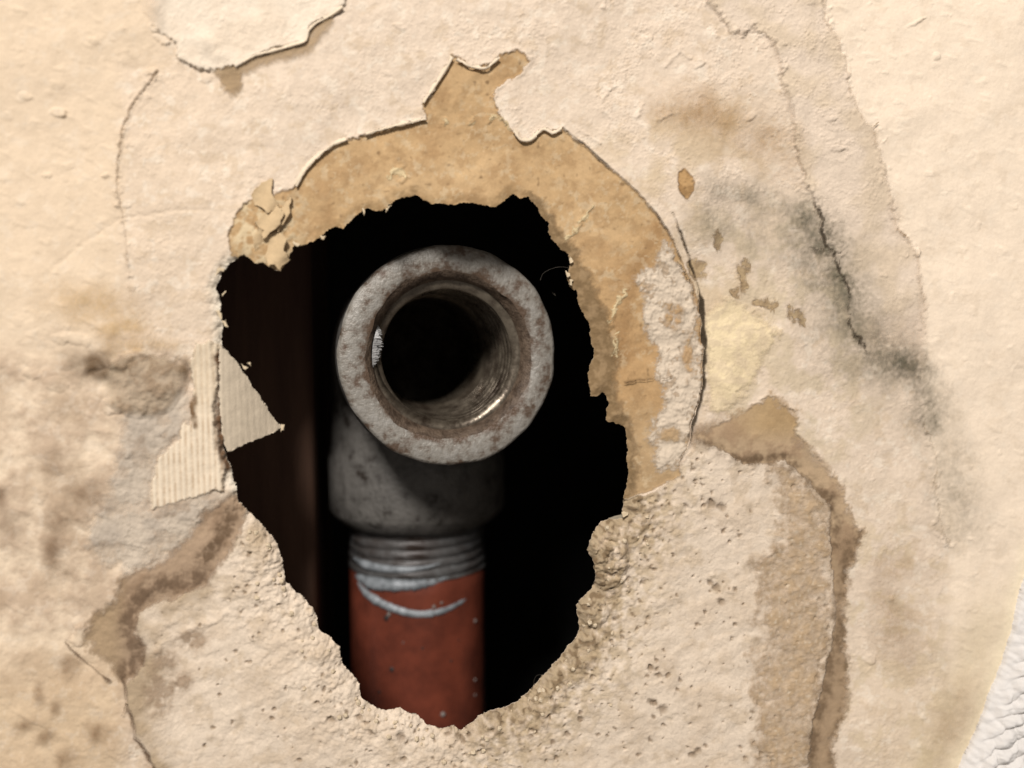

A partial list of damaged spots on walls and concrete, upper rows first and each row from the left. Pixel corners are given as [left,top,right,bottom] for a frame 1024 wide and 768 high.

peeling [152,0,345,93]
crack [563,127,609,167]
peeling [678,168,695,198]
crack [814,204,850,294]
water stain [82,355,112,378]
crack [652,208,707,457]
crack [848,319,866,351]
flaking render [84,178,864,768]